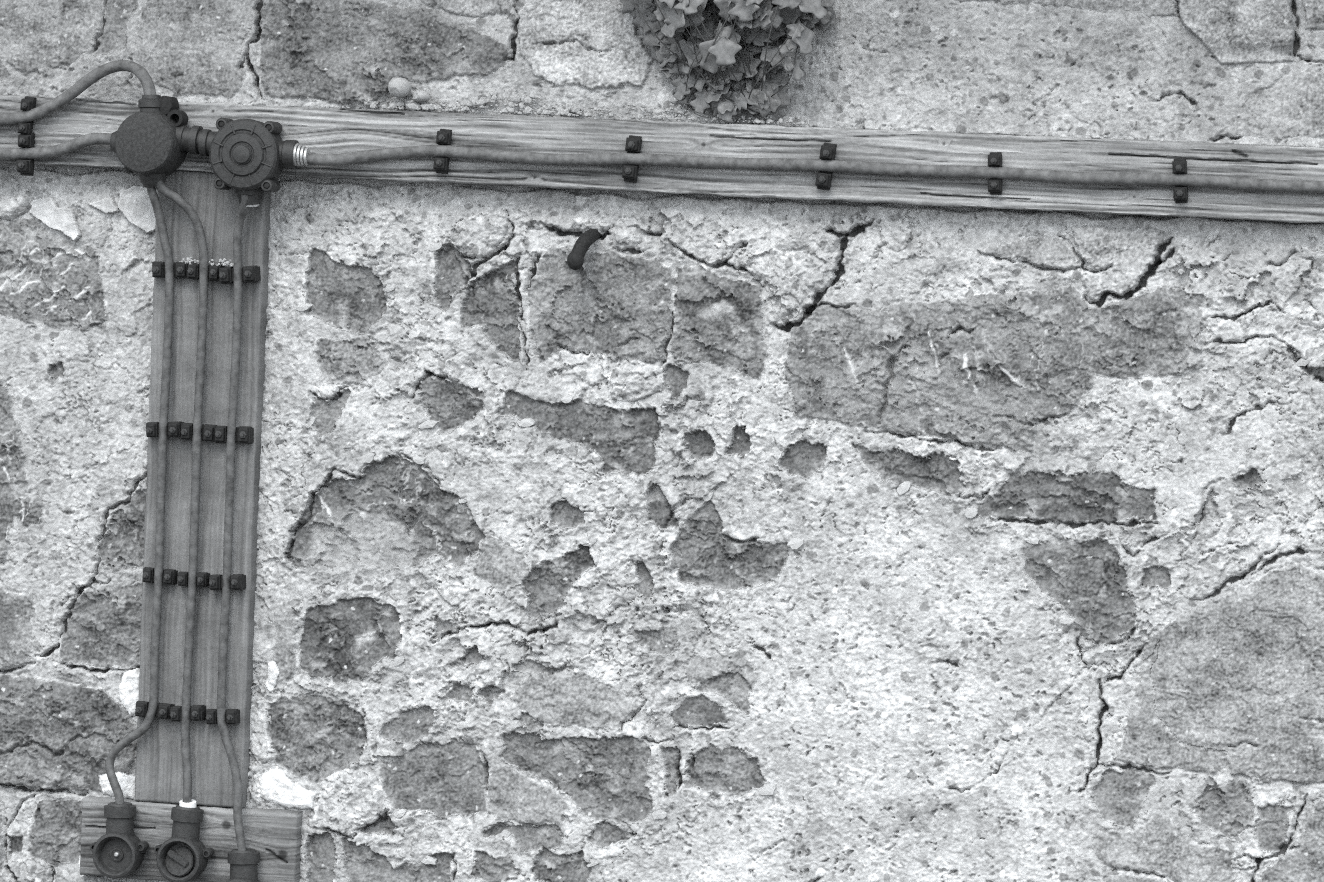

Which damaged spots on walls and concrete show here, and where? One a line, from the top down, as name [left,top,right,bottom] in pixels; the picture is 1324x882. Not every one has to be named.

spalling [296,248,395,334]
spalling [428,242,526,362]
crack [775,222,873,332]
crack [988,236,1174,307]
crack [0,473,147,674]
spalling [283,452,485,570]
spalling [521,500,598,620]
spalling [416,373,805,591]
spalling [852,444,1171,648]
spalling [266,597,777,882]
crack [1076,629,1157,792]
crack [1243,801,1306,882]